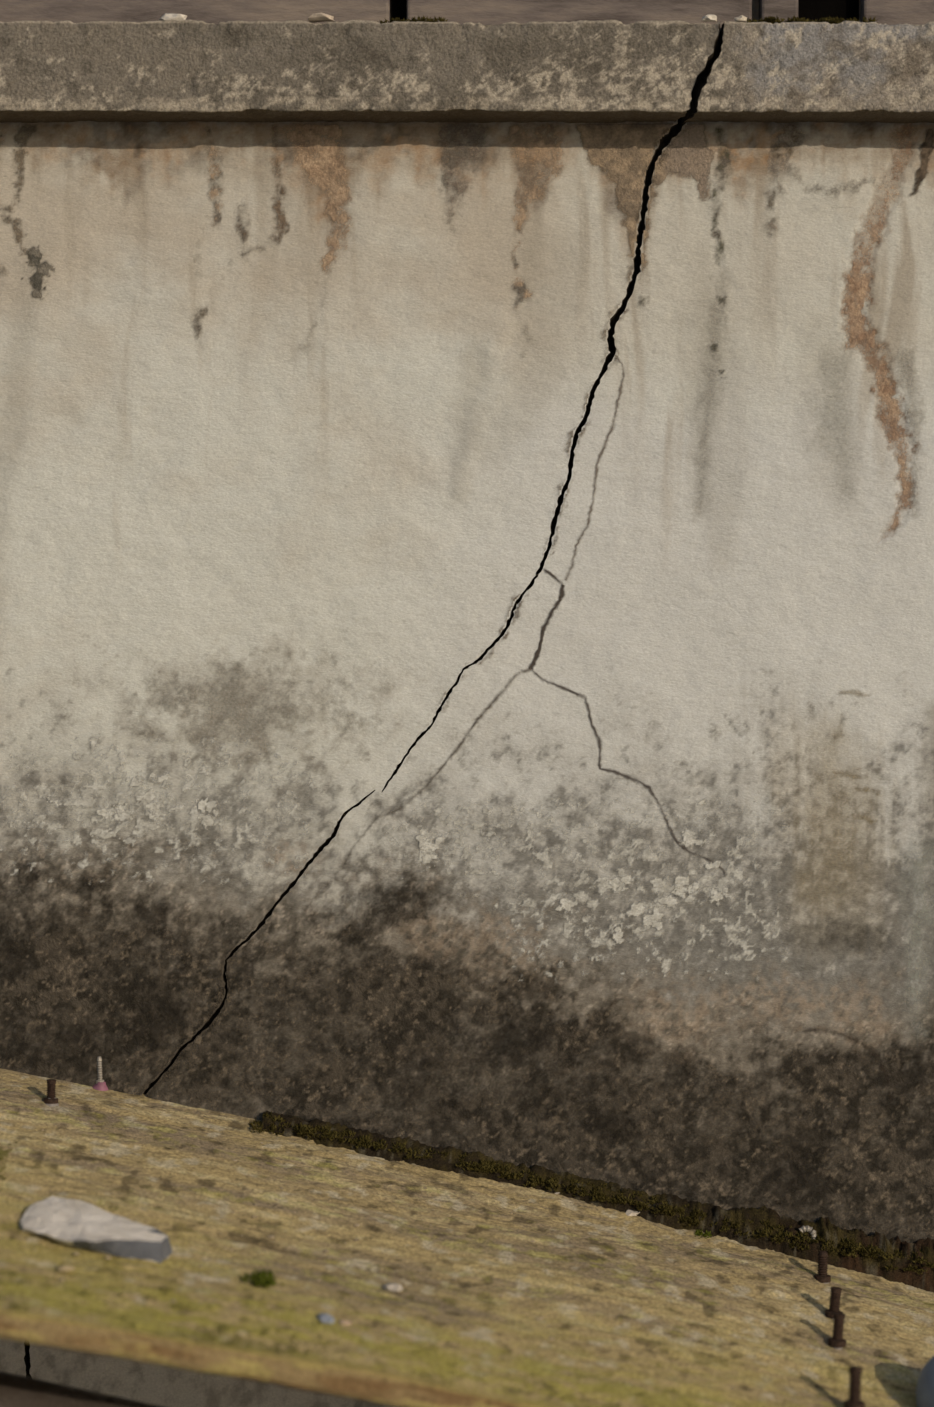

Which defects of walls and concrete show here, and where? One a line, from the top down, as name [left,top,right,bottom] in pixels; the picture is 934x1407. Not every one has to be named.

water stain [4,125,36,252]
water stain [208,129,222,223]
water stain [272,124,351,270]
water stain [439,124,485,215]
water stain [507,124,563,304]
water stain [712,128,731,252]
water stain [766,125,799,229]
rust [841,123,934,531]
crack [143,23,726,1094]
peeling [1,738,315,883]
water stain [0,858,934,1243]
crack [24,1343,32,1378]